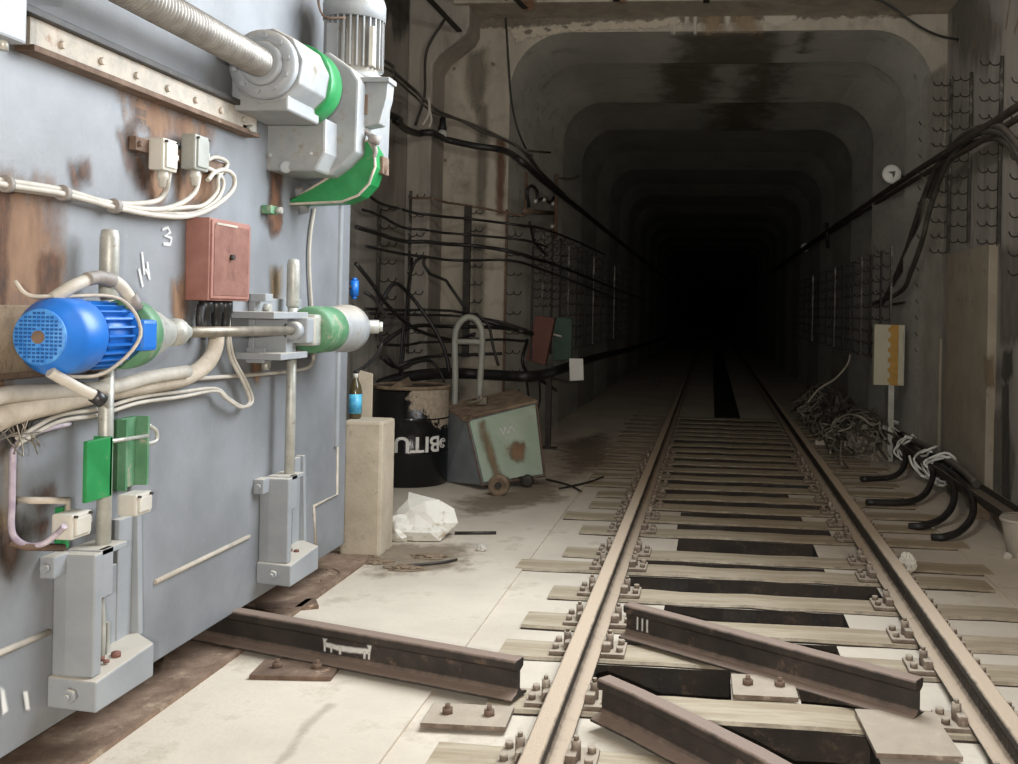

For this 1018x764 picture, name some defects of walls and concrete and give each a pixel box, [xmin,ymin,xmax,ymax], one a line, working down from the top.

spalling [509,17,687,44]
damp [480,14,912,130]
corrosion [121,91,210,199]
corrosion [176,169,217,212]
corrosion [0,191,65,305]